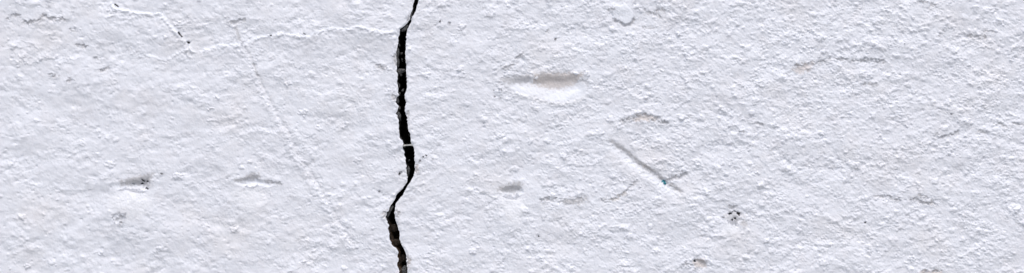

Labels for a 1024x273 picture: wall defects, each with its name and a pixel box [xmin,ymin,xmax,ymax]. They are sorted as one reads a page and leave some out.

crack [108,0,420,273]